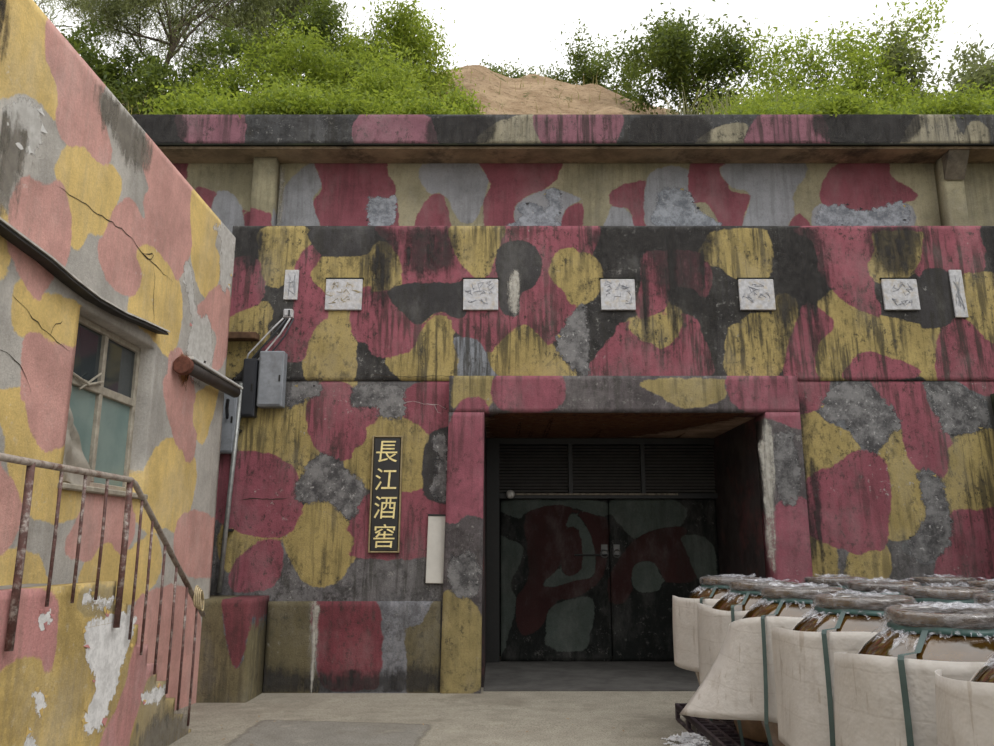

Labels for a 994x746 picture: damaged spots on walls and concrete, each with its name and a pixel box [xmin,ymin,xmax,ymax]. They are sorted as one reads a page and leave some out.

crack [60,187,173,318]
leakage [370,226,457,314]
leakage [508,271,520,313]
leakage [590,227,717,367]
leakage [775,227,829,360]
leakage [868,227,921,275]
leakage [983,226,994,273]
peeling [24,727,36,746]
peeling [30,687,48,718]
peeling [81,588,137,736]